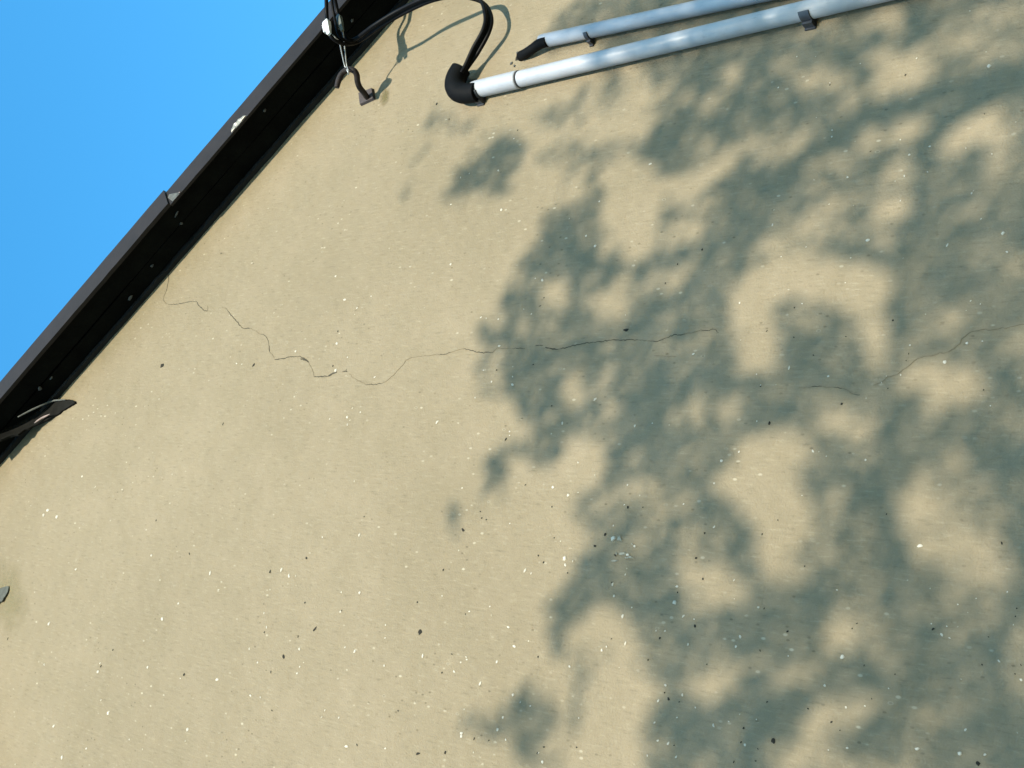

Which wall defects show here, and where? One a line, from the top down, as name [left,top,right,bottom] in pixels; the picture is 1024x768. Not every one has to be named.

crack [163,274,719,385]